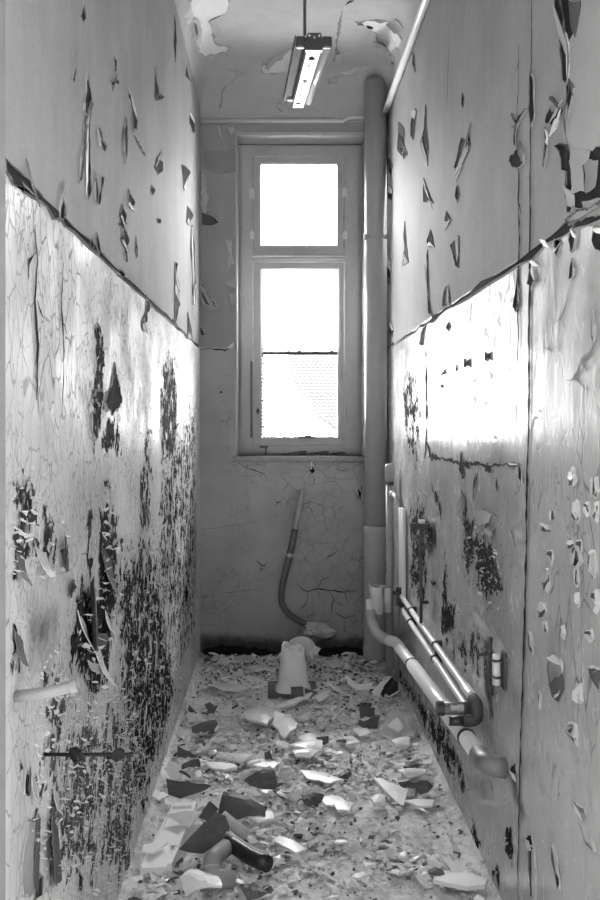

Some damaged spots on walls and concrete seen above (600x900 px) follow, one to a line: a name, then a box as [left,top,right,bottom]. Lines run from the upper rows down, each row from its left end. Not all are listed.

flaking render [173,0,231,70]
crack [28,231,67,406]
peeling [72,47,107,206]
peeling [91,313,123,469]
spalling [5,148,235,348]
peeling [110,56,163,175]
crack [424,0,552,887]
peeling [387,0,600,350]
crack [566,340,597,390]
peeling [6,349,276,900]
crack [297,550,357,632]
peeling [538,654,600,710]